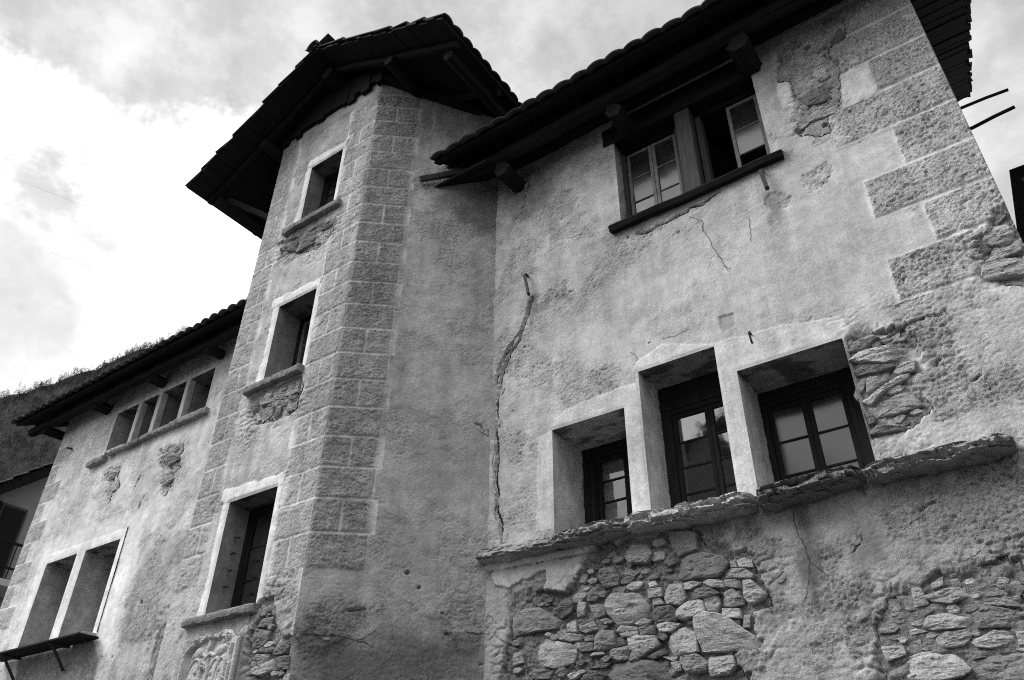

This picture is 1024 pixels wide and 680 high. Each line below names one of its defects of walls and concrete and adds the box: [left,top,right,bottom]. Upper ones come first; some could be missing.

spalling [776,17,847,137]
spalling [279,219,336,257]
crack [640,192,730,271]
spalling [249,377,303,425]
crack [475,299,534,543]
spalling [848,328,933,438]